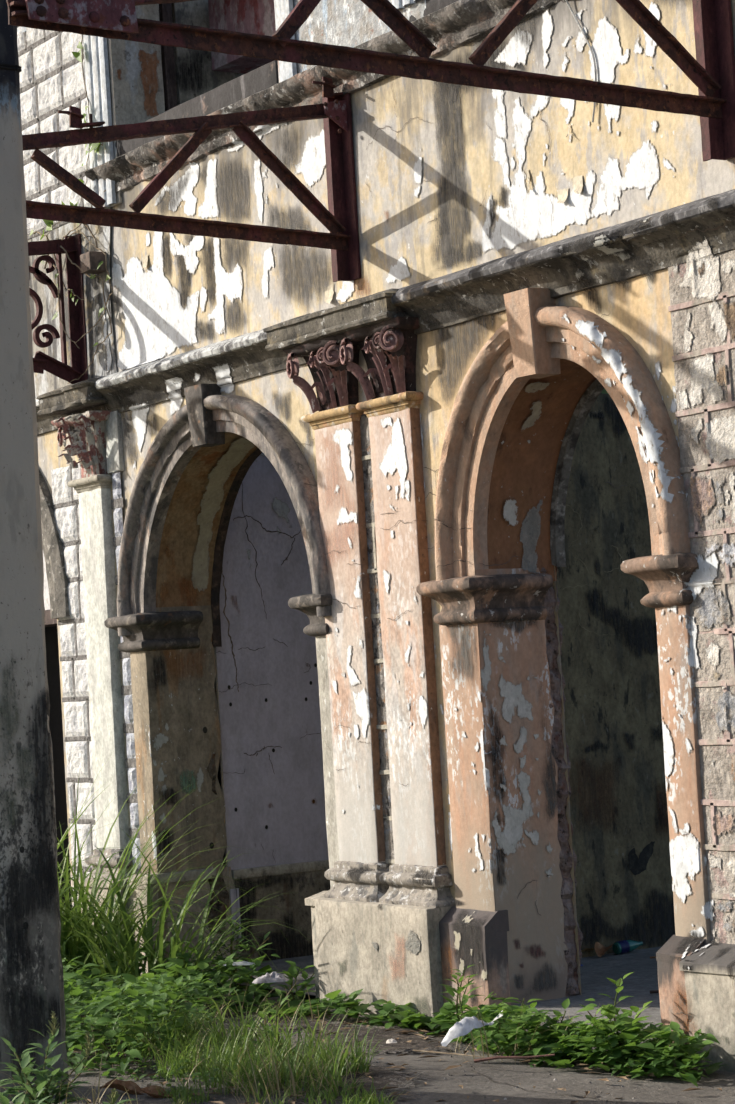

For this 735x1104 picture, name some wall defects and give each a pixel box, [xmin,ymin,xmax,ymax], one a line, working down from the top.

peeling [495,9,657,83]
peeling [154,158,219,219]
leakage [434,82,481,267]
peeling [481,89,675,253]
peeling [102,231,243,372]
leakage [590,398,627,437]
peeling [562,311,735,525]
crack [216,484,326,703]
leakage [587,589,658,657]
leakage [0,663,58,974]
peeling [669,809,735,904]
leakage [581,890,735,979]